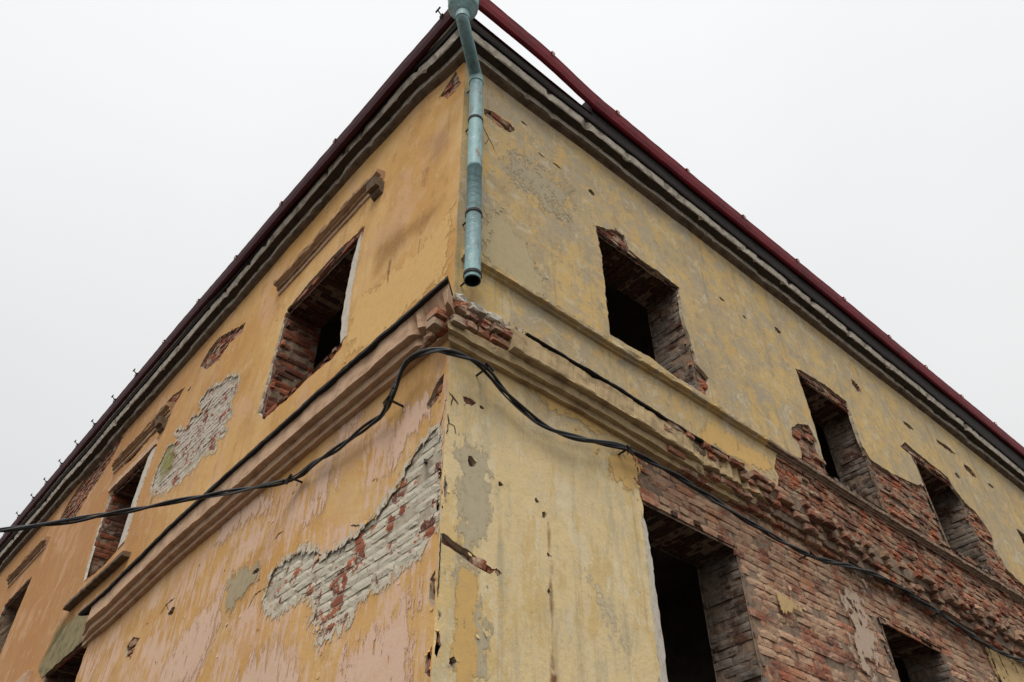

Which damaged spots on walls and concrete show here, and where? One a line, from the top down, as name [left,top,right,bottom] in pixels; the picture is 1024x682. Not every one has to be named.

flaking render [439,71,461,99]
flaking render [484,108,527,132]
flaking render [200,315,252,369]
flaking render [150,371,501,682]
flaking render [595,444,1024,682]
flaking render [699,368,1024,633]